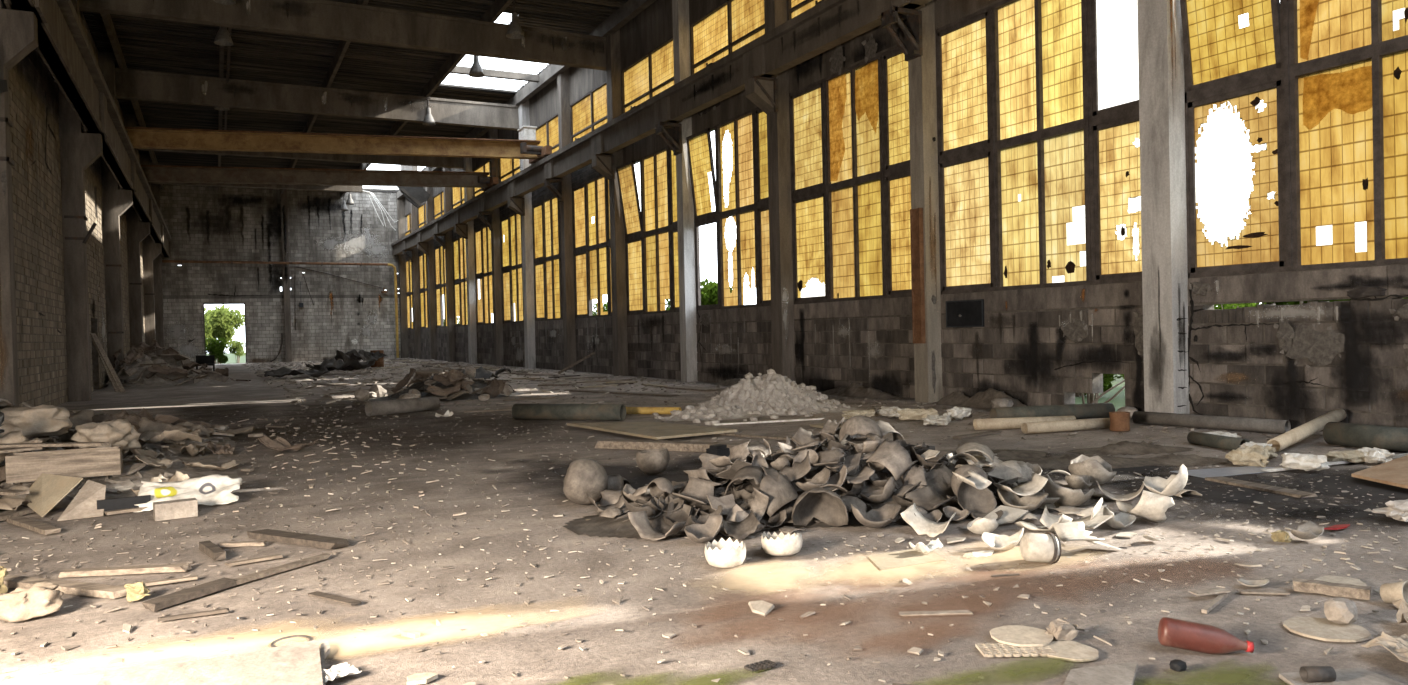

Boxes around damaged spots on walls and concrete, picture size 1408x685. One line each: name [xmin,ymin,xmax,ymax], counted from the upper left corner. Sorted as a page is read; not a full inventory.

water stain [186,206,286,287]
water stain [307,197,384,254]
water stain [1257,303,1359,398]